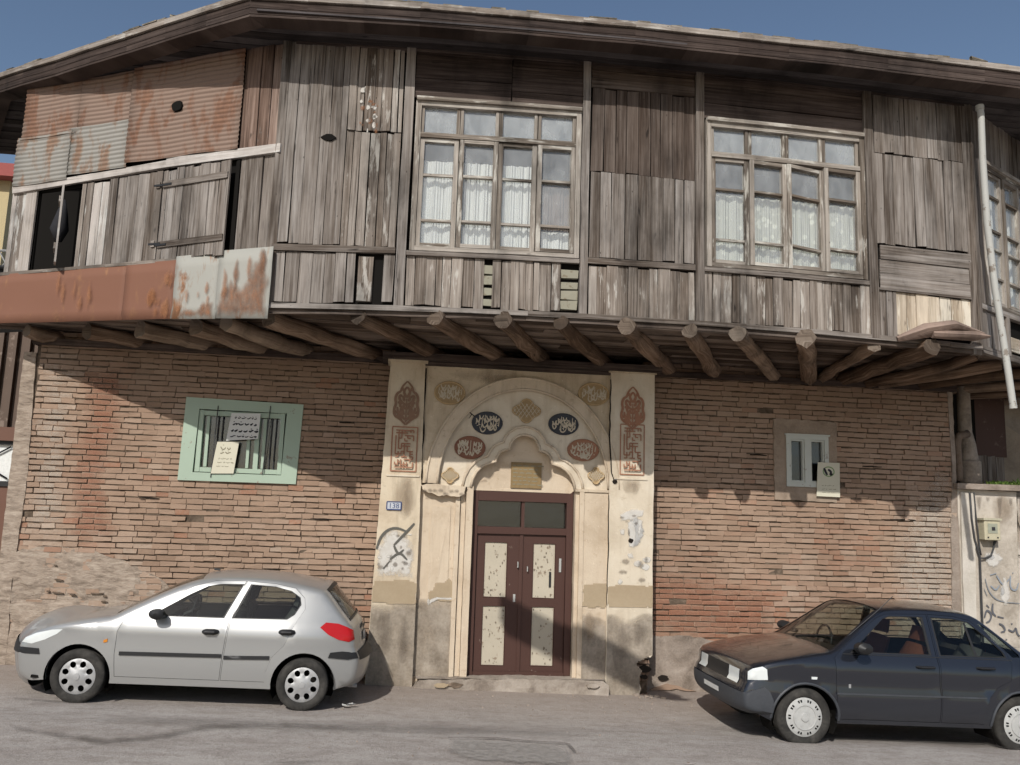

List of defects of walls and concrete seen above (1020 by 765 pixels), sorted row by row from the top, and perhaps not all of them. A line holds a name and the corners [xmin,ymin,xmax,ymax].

rust [147,251,265,315]
peeling [376,523,415,576]
peeling [621,510,651,570]
leakage [365,579,452,687]
leakage [581,587,761,695]
spalling [634,665,666,699]